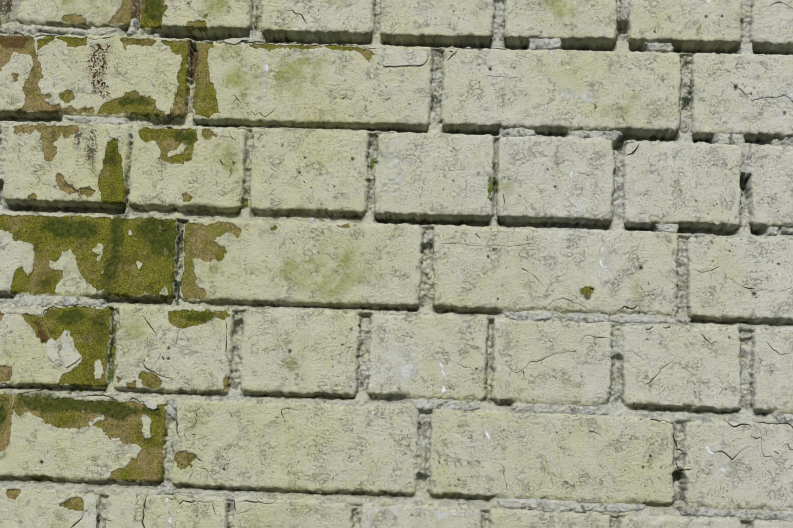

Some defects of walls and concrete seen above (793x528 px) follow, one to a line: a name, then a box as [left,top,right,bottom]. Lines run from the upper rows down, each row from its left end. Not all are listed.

peeling [0,0,428,164]
crack [731,82,793,102]
peeling [56,138,128,209]
peeling [0,214,241,329]
peeling [0,365,12,382]
peeling [22,306,114,388]
peeling [116,371,162,390]
peeling [0,393,168,484]
peeling [174,450,197,470]
crack [712,421,793,469]